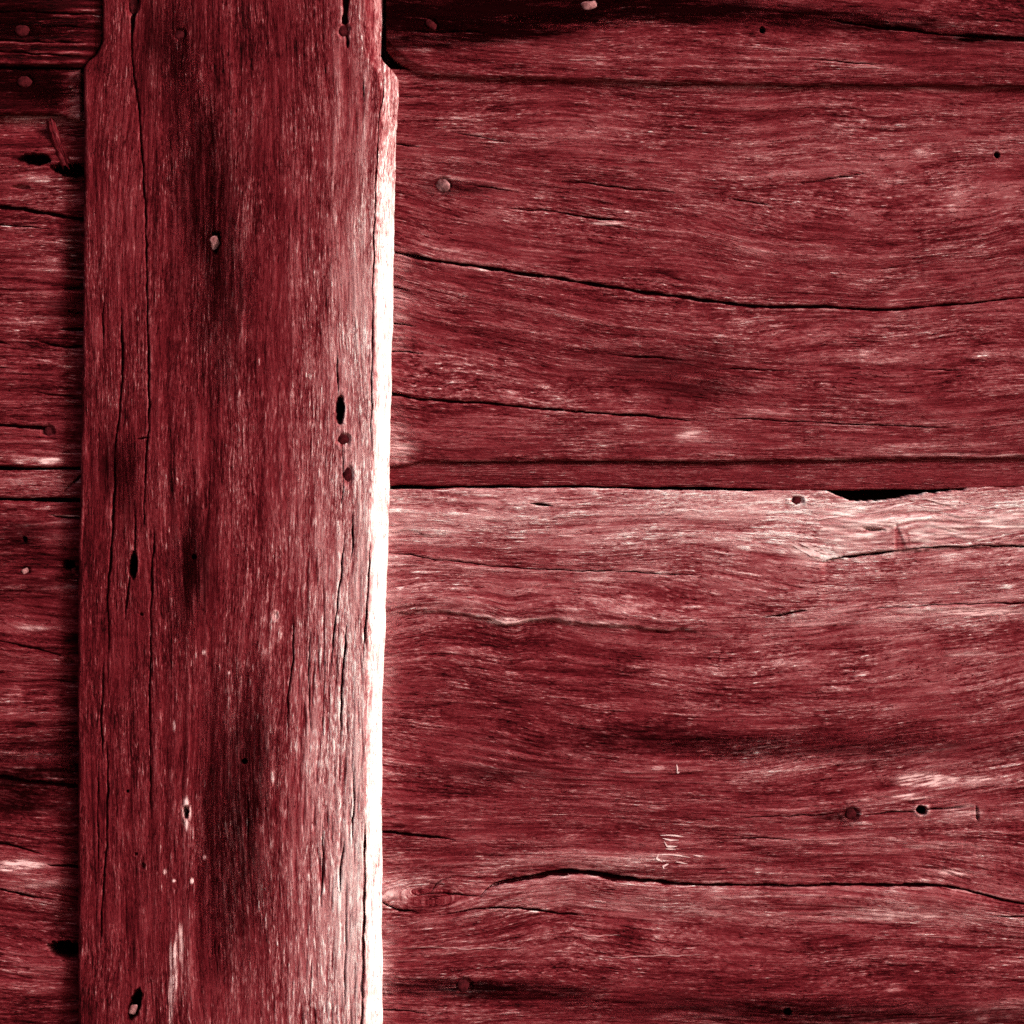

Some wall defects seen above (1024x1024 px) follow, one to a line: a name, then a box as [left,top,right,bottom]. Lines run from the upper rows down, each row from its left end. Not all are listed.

crack [363,66,1024,452]
crack [0,0,155,946]
crack [320,763,1024,1024]